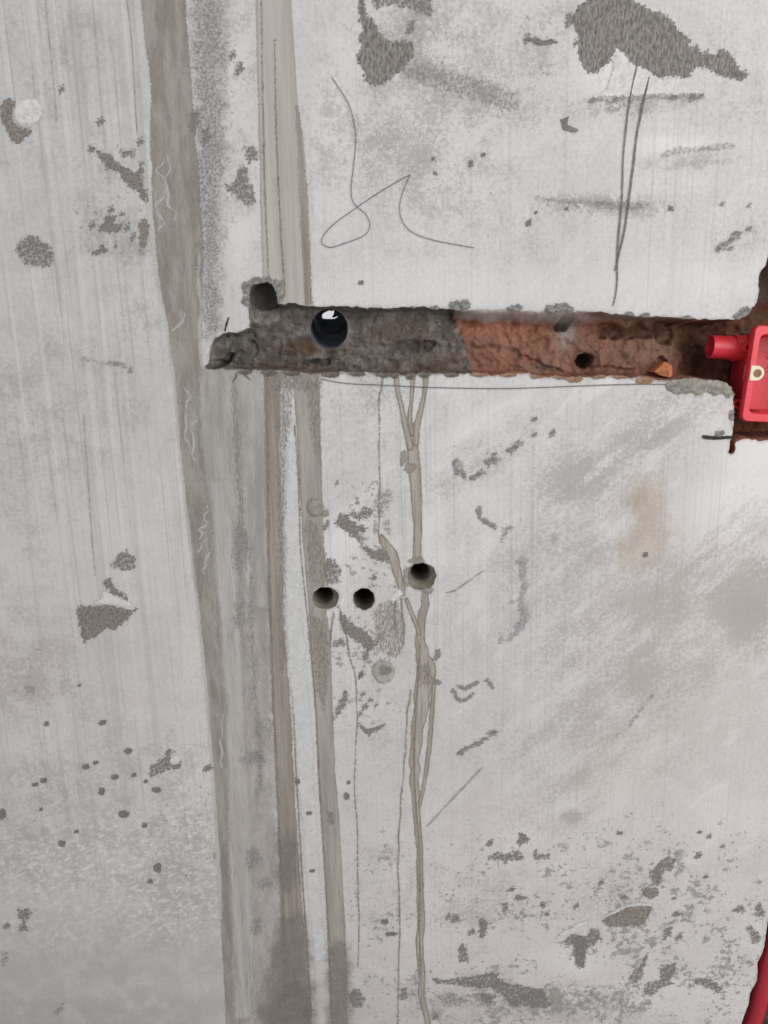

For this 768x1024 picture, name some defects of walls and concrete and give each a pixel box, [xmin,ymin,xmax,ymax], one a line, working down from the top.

peeling [356,0,519,112]
peeling [565,0,749,82]
peeling [0,97,43,144]
peeling [87,136,149,203]
peeling [88,204,150,256]
flaking render [431,258,768,395]
flaking render [728,411,768,454]
damp [127,0,360,1024]
peeling [322,480,391,581]
peeling [75,548,138,644]
peeling [555,856,677,969]
peeling [431,913,552,1020]